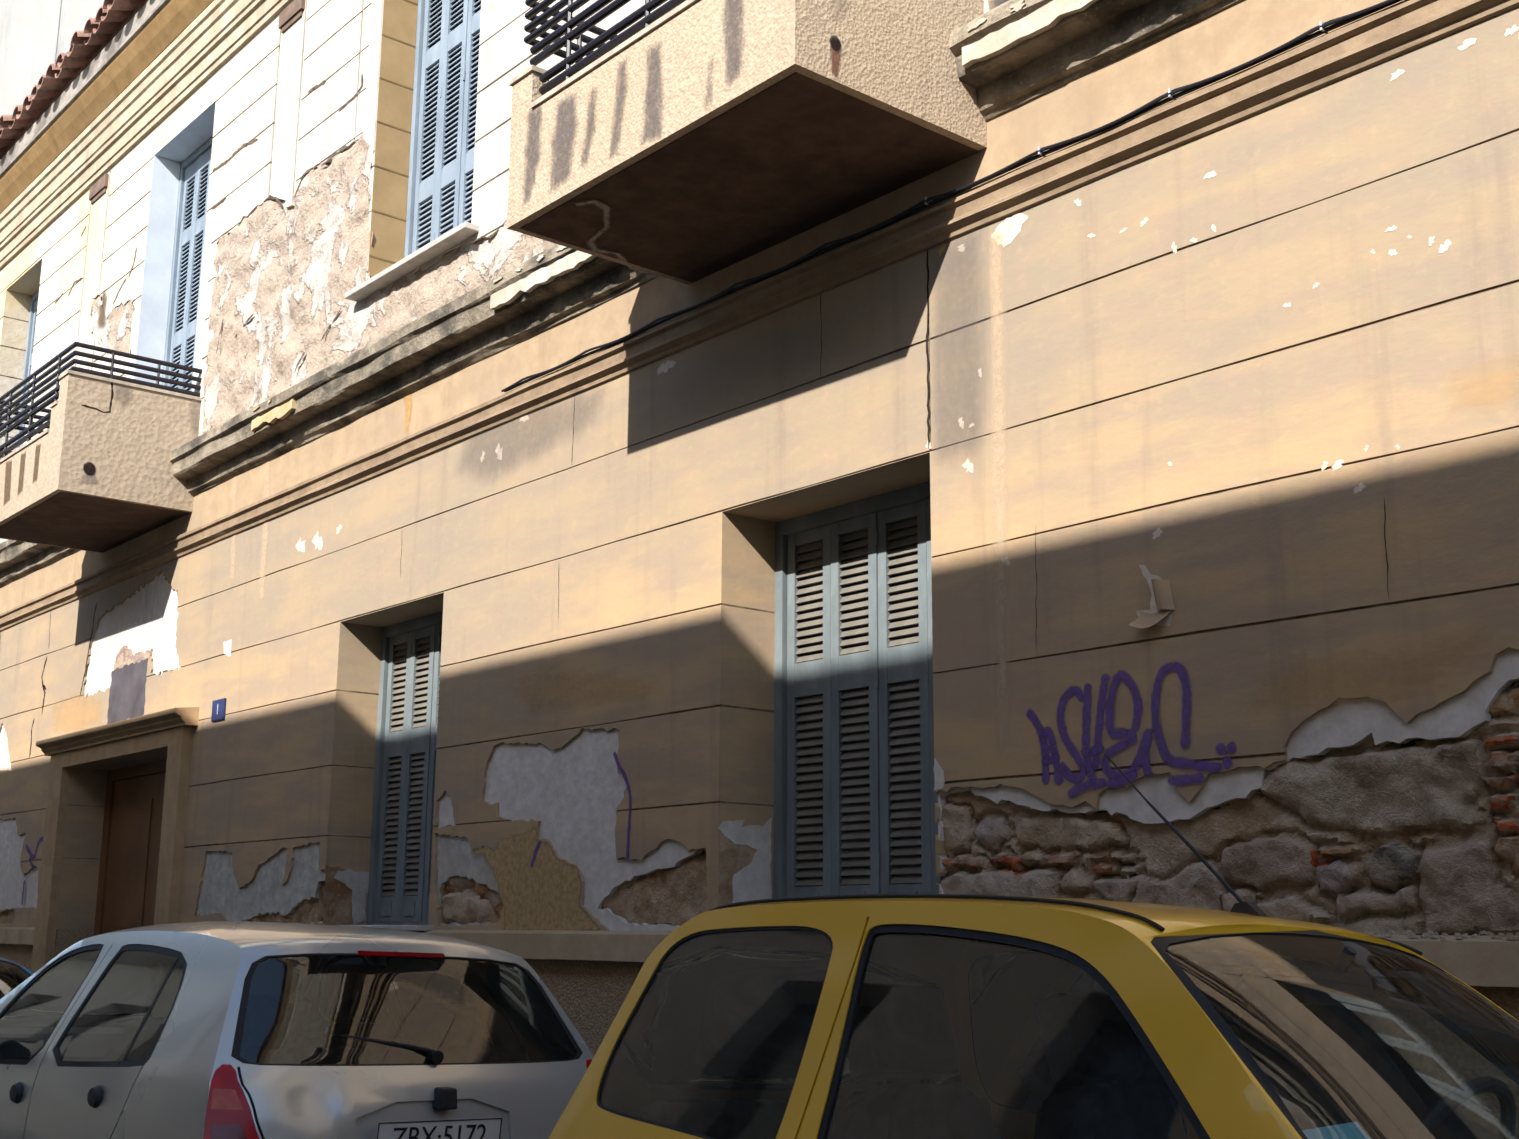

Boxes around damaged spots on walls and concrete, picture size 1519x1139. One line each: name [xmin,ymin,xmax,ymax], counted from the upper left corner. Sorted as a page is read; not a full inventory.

leakage [525,97,594,200]
leakage [610,63,625,155]
leakage [644,49,660,140]
leakage [726,0,742,81]
rust [831,46,840,76]
peeling [1370,226,1452,256]
peeling [84,572,181,697]
peeling [0,726,11,770]
peeling [0,819,38,924]
peeling [197,843,369,925]
peeling [437,729,772,931]
flaking render [934,648,1519,939]